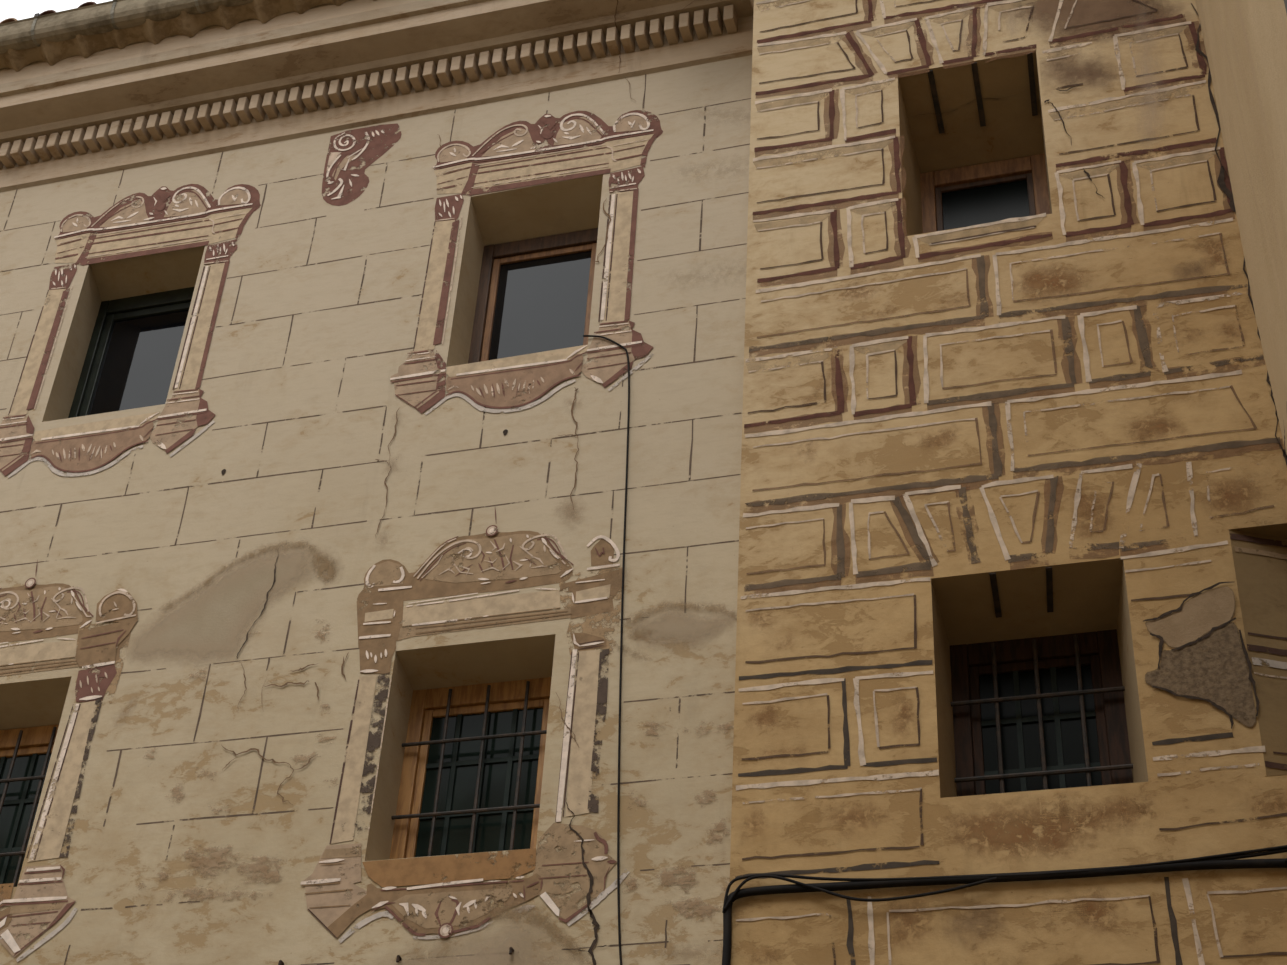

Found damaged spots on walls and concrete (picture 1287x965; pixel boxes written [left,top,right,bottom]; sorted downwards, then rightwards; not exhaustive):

crack [237,550,349,709]
spalling [1143,582,1260,729]
crack [221,744,318,805]
crack [563,798,607,965]